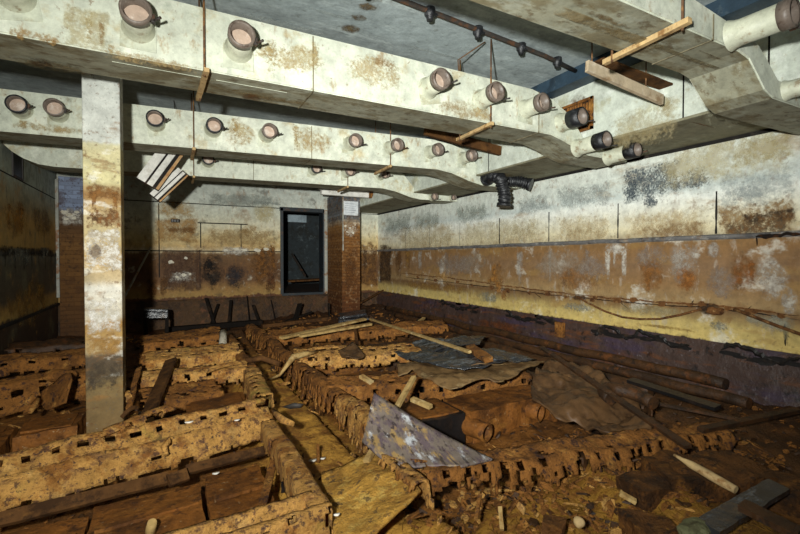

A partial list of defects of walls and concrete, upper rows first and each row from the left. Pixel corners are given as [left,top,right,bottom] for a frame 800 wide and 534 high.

rust [87,185,120,226]
mould [623,161,709,206]
leakage [160,251,243,294]
rust [253,246,276,290]
leakage [747,260,795,339]